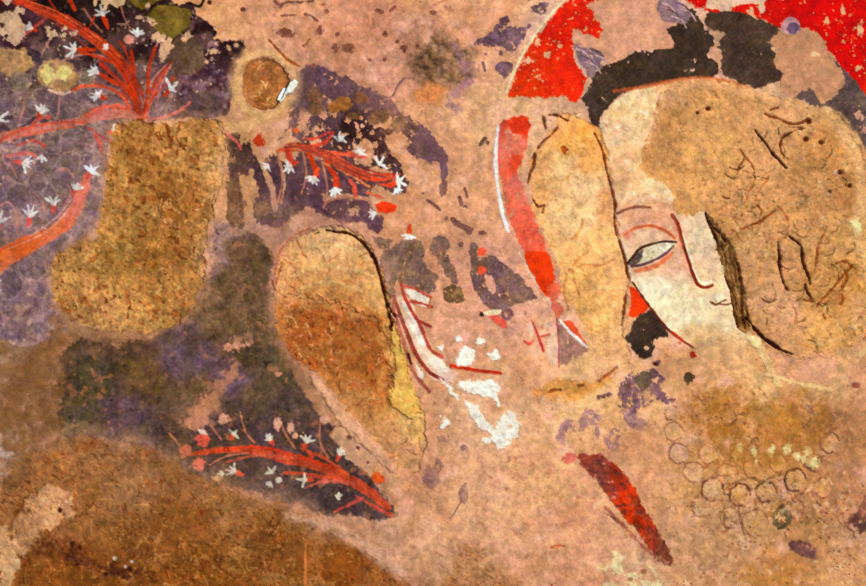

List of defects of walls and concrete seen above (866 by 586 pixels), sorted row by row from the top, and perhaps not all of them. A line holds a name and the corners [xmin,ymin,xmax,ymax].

peeling [0,0,27,46]
peeling [40,65,73,96]
peeling [45,26,79,40]
peeling [136,3,195,63]
flaking render [49,43,300,335]
flaking render [528,113,631,402]
flaking render [639,28,866,392]
flaking render [274,226,428,474]
flaking render [0,437,521,586]